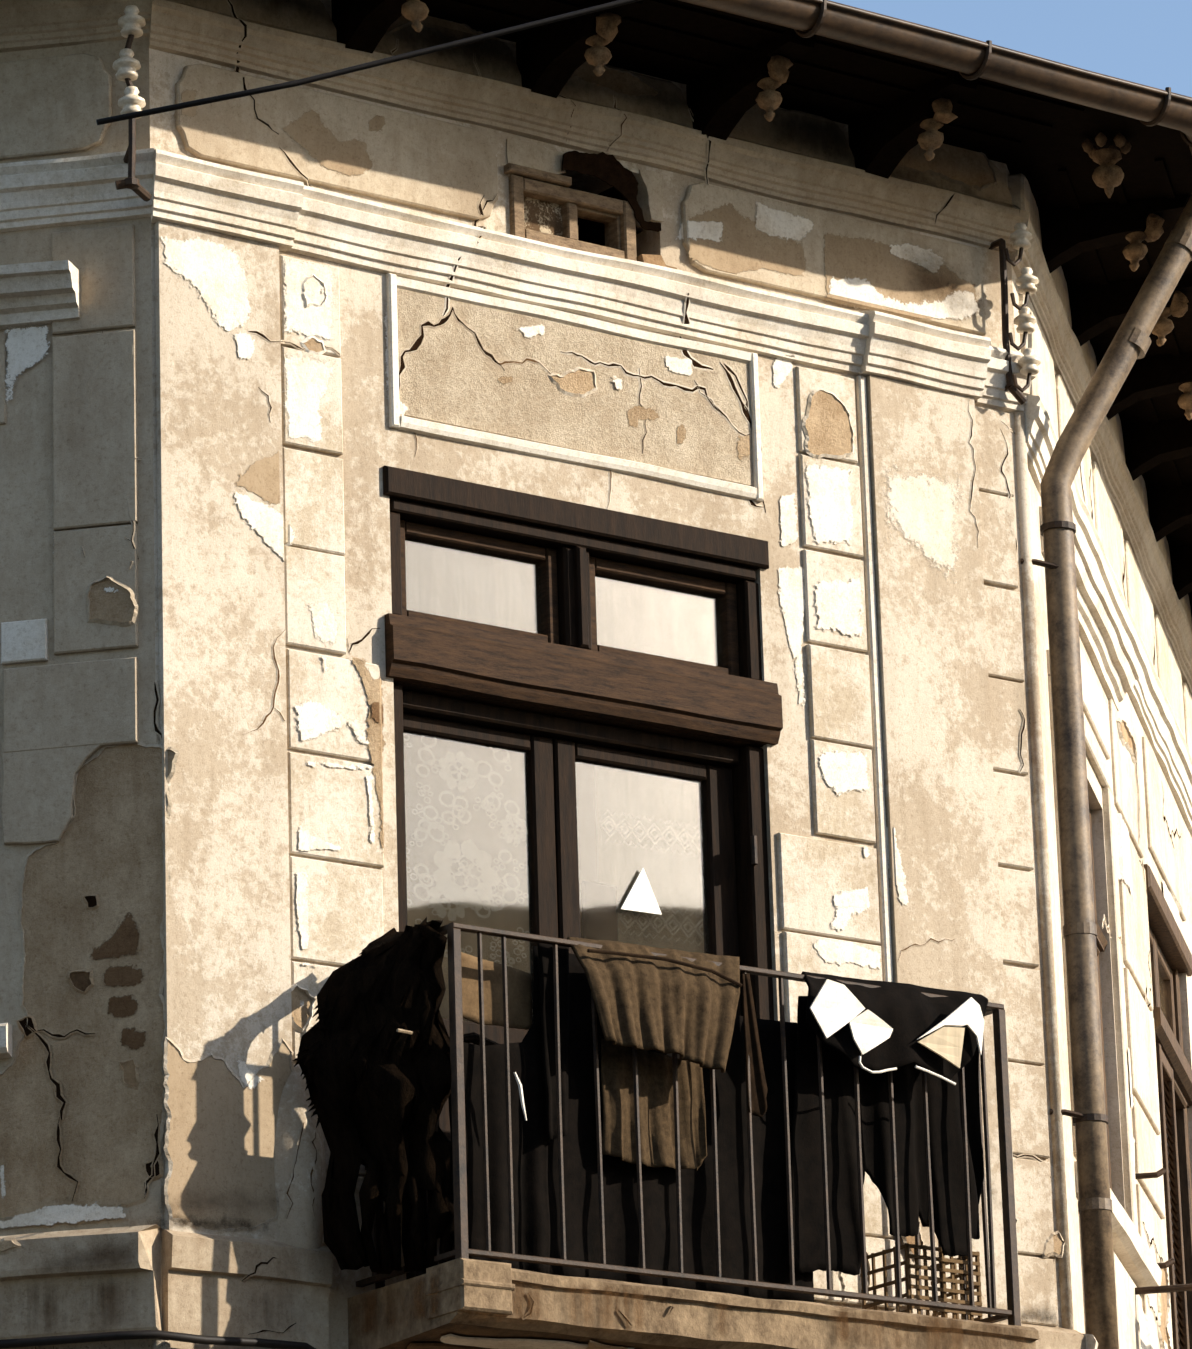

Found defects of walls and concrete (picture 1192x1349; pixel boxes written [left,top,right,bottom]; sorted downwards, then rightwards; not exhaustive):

crack [226,0,358,198]
peeling [161,235,255,360]
peeling [281,257,336,442]
crack [398,193,767,513]
spalling [676,201,980,322]
peeling [780,388,856,546]
peeling [295,656,386,853]
spalling [0,742,316,1255]
crack [25,1023,95,1202]
crack [240,1256,289,1282]
crack [1147,1294,1158,1322]
crack [1143,1221,1164,1263]